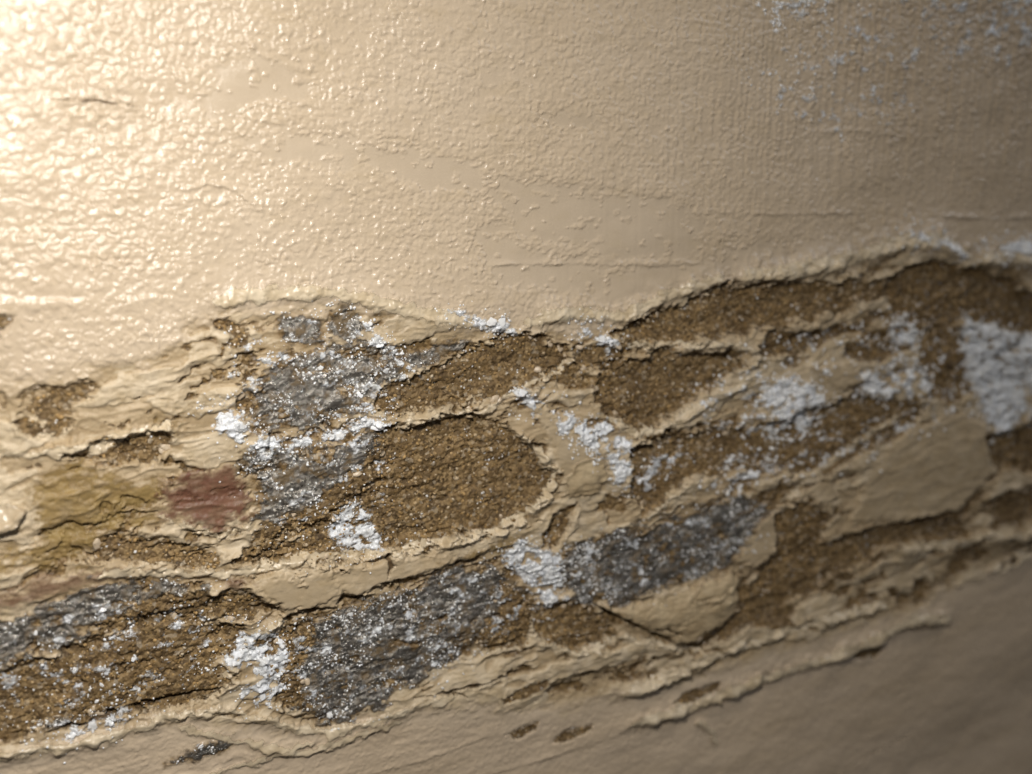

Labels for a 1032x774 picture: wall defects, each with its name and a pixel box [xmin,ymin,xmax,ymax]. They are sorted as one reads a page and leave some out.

leakage [741,0,1032,142]
leakage [171,740,234,765]
spalling [0,231,1032,774]
leakage [0,299,1032,756]